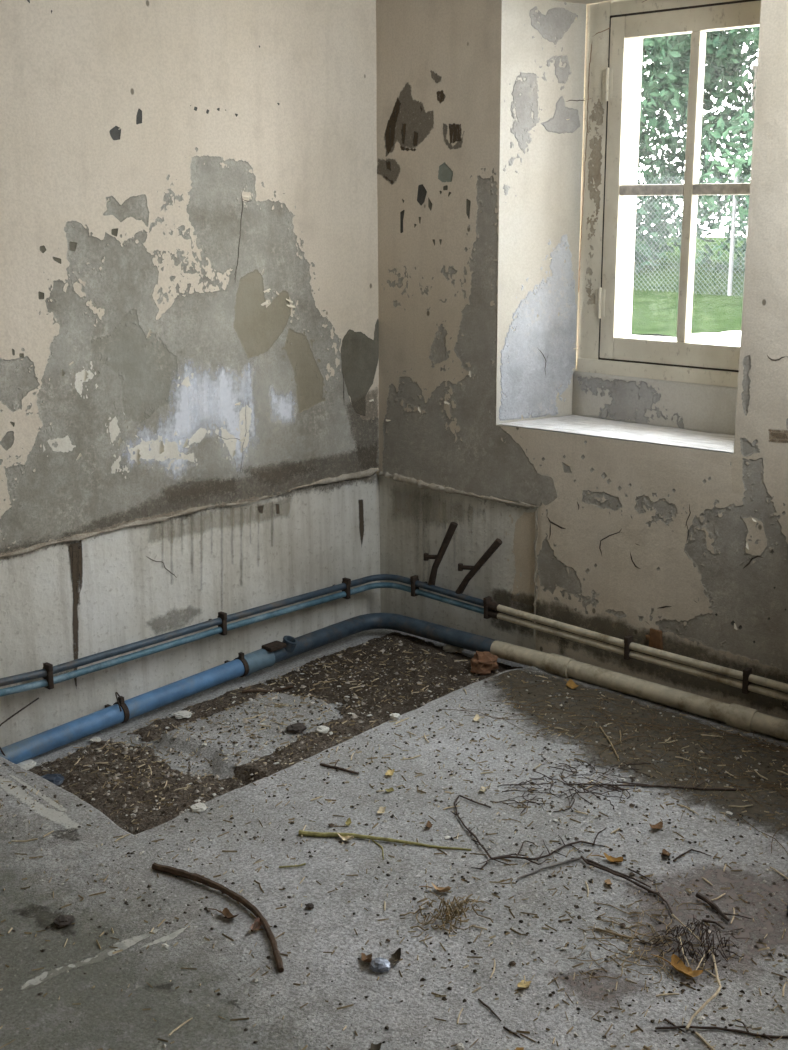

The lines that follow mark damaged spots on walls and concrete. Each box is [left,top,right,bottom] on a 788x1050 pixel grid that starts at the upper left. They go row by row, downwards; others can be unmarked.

peeling [0,2,788,676]
flaking render [173,710,192,719]
water stain [1,366,378,687]
water stain [491,590,788,714]